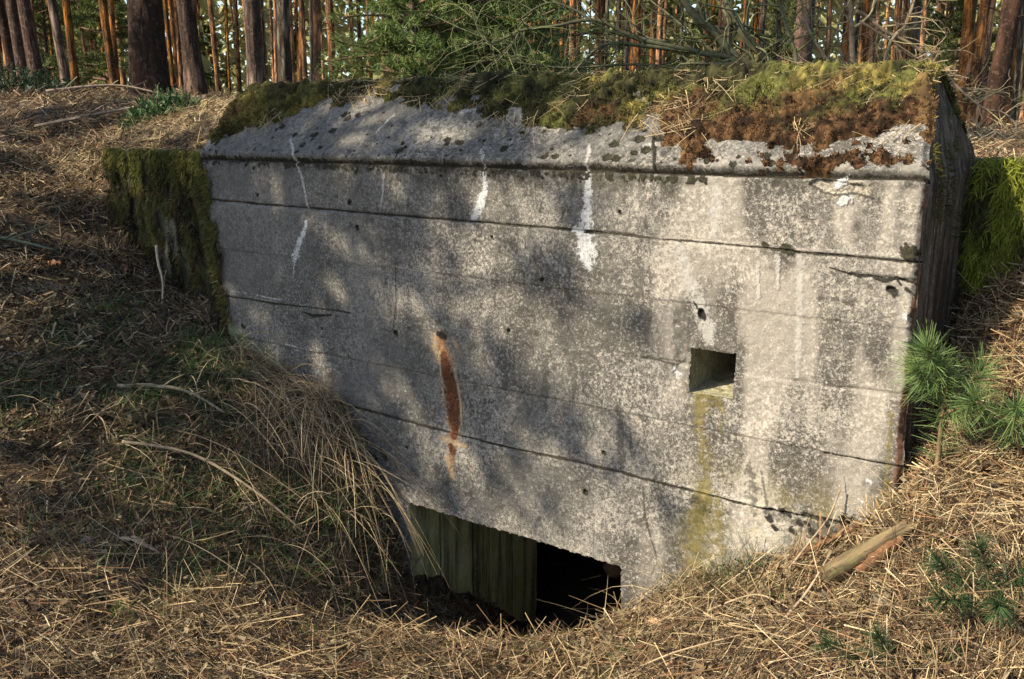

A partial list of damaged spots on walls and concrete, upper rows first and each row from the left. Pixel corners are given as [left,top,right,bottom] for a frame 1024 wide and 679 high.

damp [289,139,309,278]
damp [471,149,488,221]
damp [572,145,598,272]
corrosion [431,331,467,480]